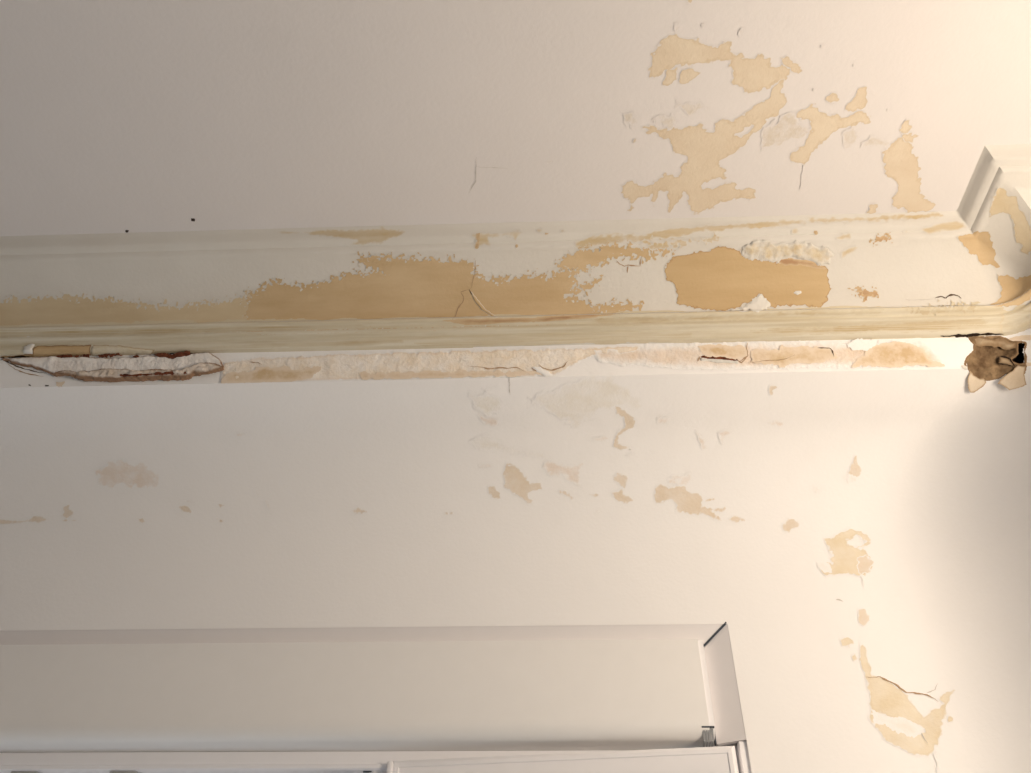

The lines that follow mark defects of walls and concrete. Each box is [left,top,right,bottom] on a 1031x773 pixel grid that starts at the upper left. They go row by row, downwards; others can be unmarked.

peeling [620,22,936,216]
peeling [240,251,607,335]
water stain [0,211,1031,358]
peeling [664,246,832,312]
peeling [956,231,1000,268]
peeling [989,187,1031,255]
spalling [961,336,1027,393]
water stain [527,371,643,429]
peeling [478,460,634,506]
peeling [654,471,745,524]